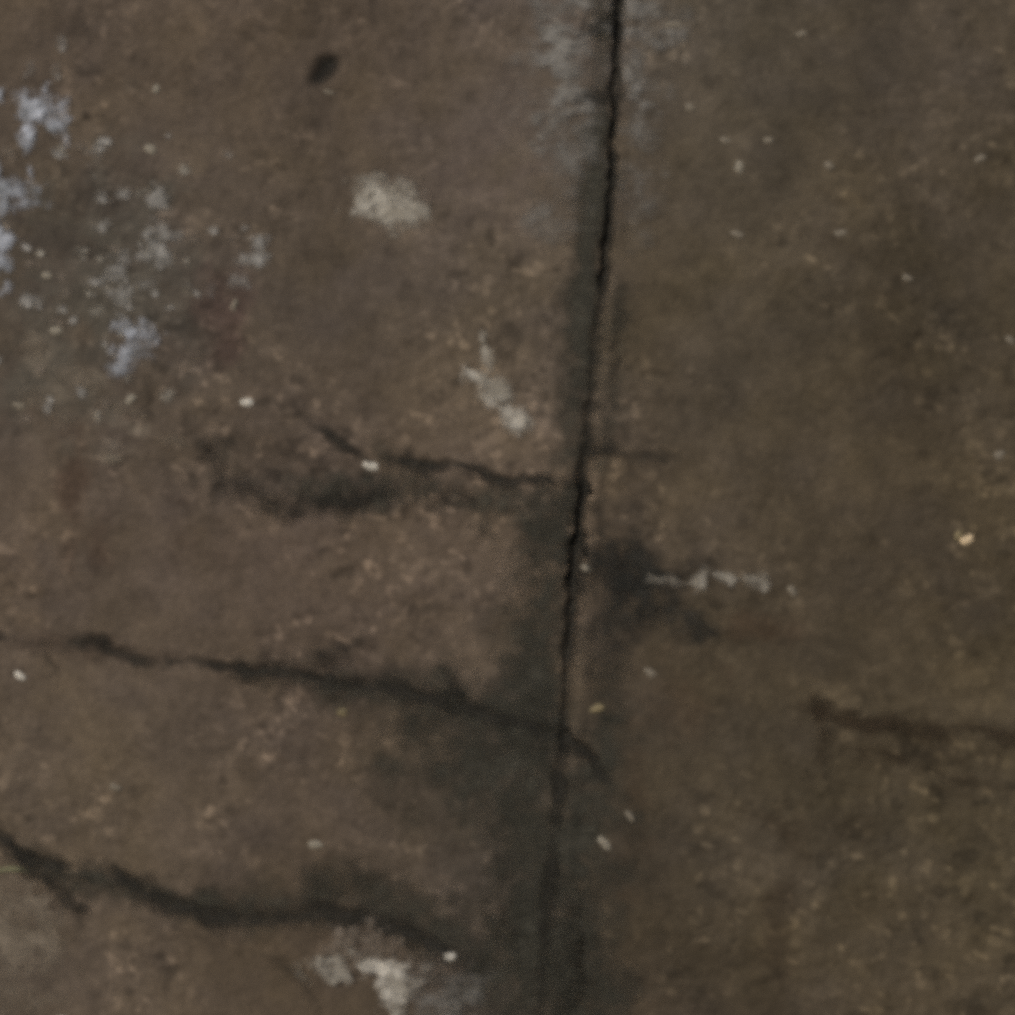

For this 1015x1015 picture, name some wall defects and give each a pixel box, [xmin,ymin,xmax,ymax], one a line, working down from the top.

water stain [353,175,428,228]
water stain [532,0,611,464]
crack [586,0,623,309]
crack [69,358,613,820]
water stain [592,539,714,640]
crack [0,833,83,910]
crack [112,865,446,951]
water stain [361,484,641,1015]